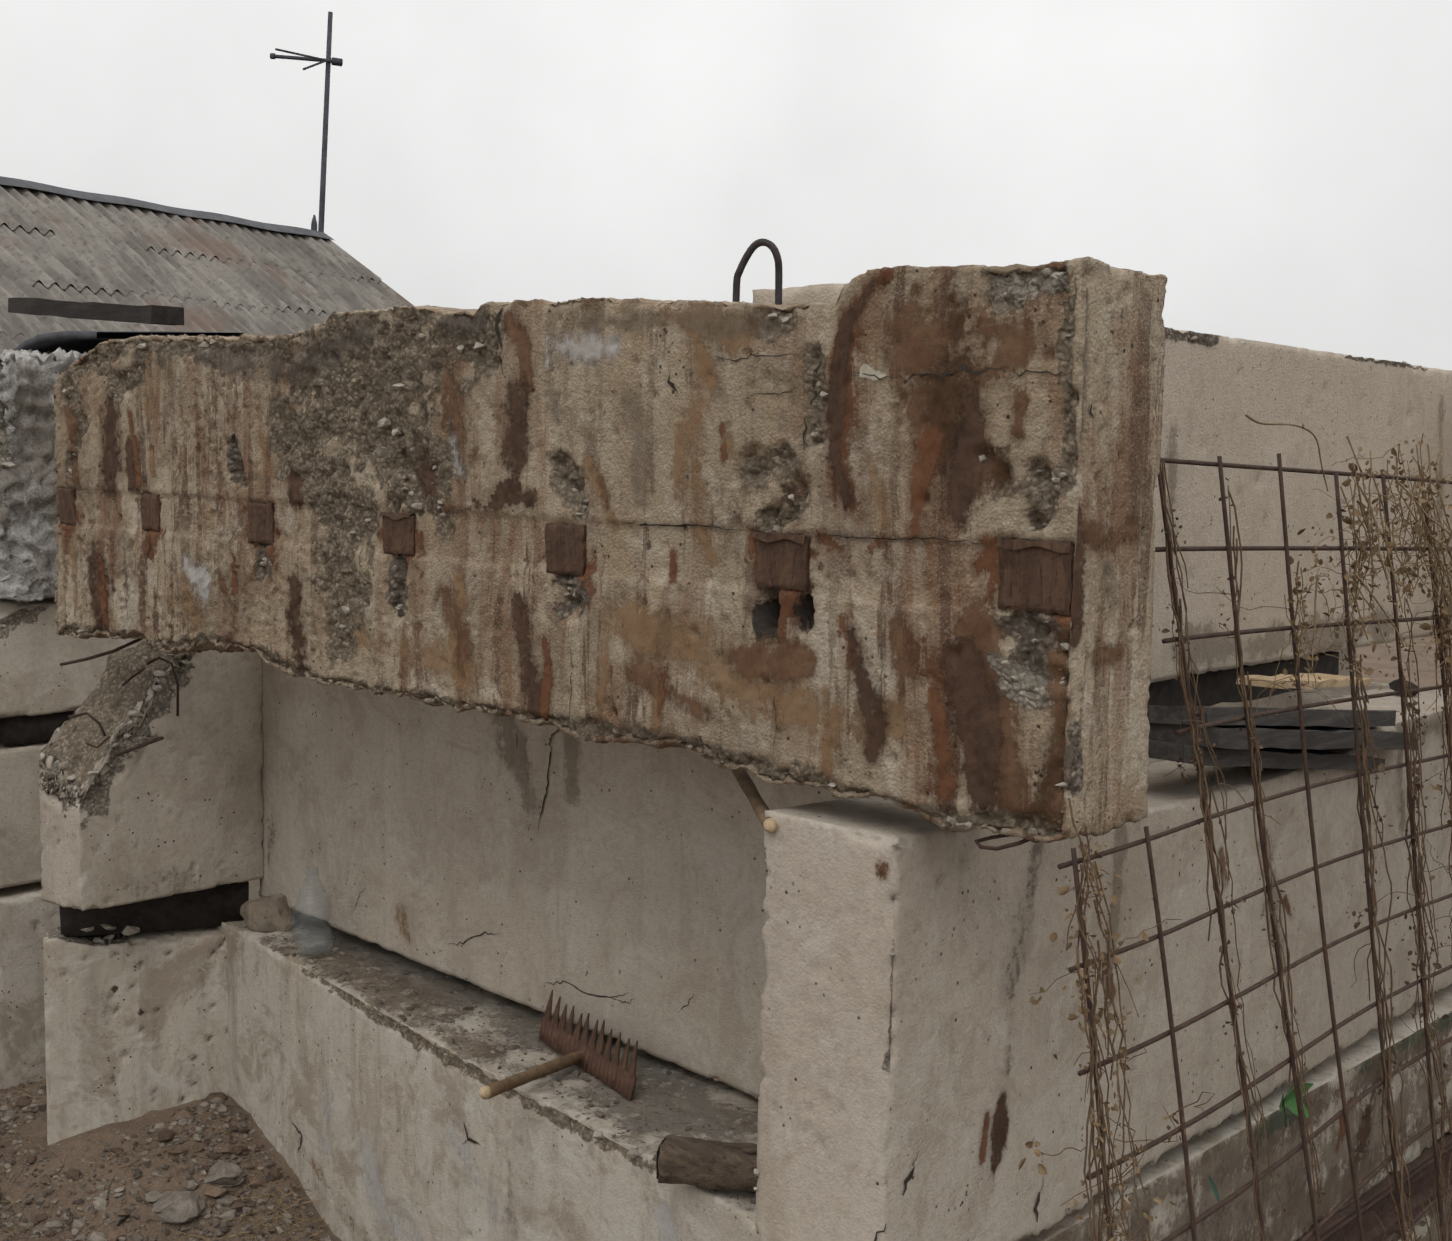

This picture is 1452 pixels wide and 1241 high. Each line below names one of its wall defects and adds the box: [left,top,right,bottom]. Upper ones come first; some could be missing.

spalling [0,605,48,638]
rust [57,502,111,631]
rust [98,395,166,560]
rust [217,526,333,676]
spalling [38,304,870,829]
rust [601,267,1139,827]
spalling [979,267,1078,531]
crack [516,632,573,828]
spalling [899,611,1084,836]
spalling [1057,453,1452,1241]
crack [543,981,632,1004]
rust [980,1092,1009,1182]